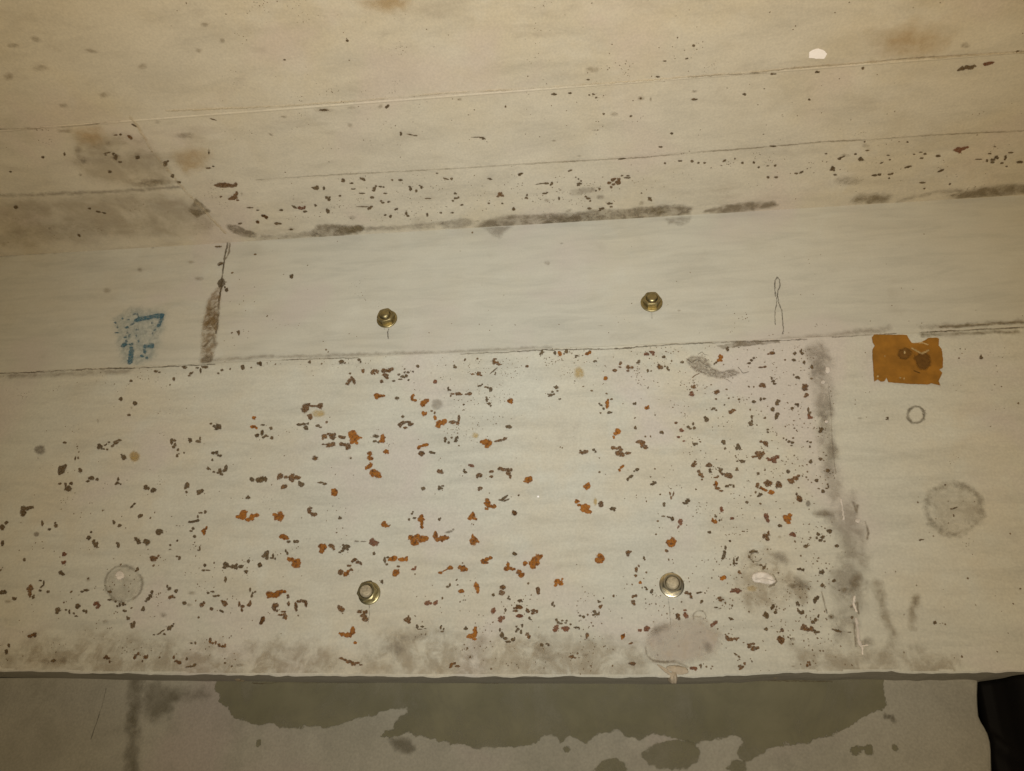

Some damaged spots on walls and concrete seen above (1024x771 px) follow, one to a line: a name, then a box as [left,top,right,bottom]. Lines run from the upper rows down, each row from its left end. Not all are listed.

water stain [316,225,363,237]
water stain [482,213,604,227]
water stain [617,206,689,219]
water stain [709,203,775,213]
corrosion [398,394,460,429]
corrosion [322,421,389,478]
corrosion [611,428,648,472]
corrosion [468,464,533,520]
corrosion [755,474,803,502]
corrosion [388,514,450,577]
corrosion [504,554,543,578]
corrosion [259,589,307,625]